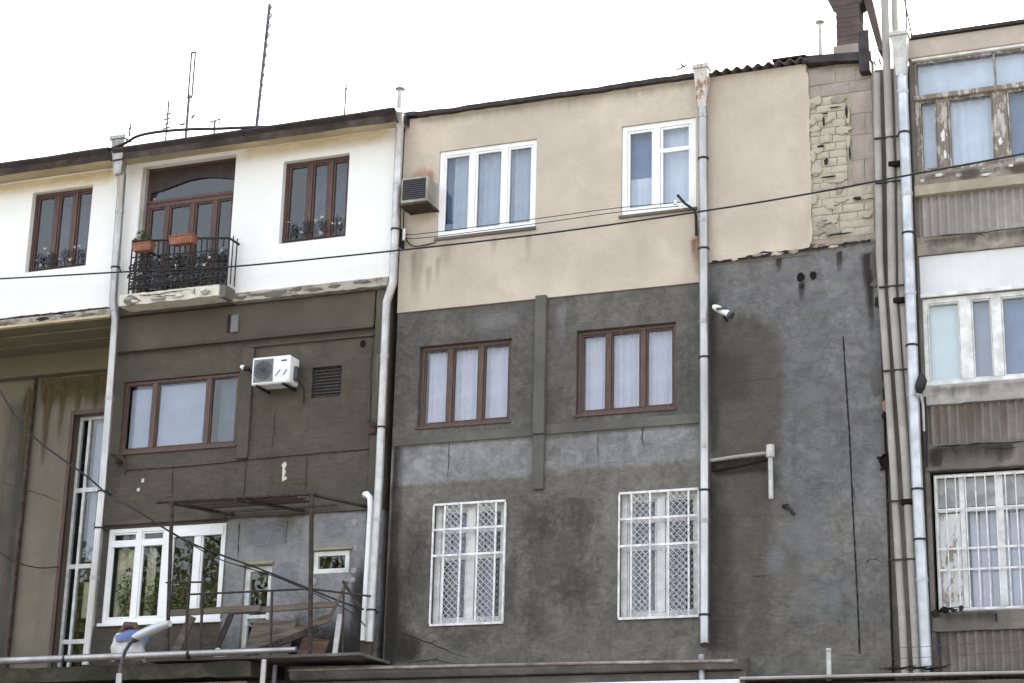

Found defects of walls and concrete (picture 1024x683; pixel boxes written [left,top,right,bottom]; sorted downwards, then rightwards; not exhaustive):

peeling [123,293,184,306]
flaking render [752,66,879,308]
leakage [0,374,107,669]